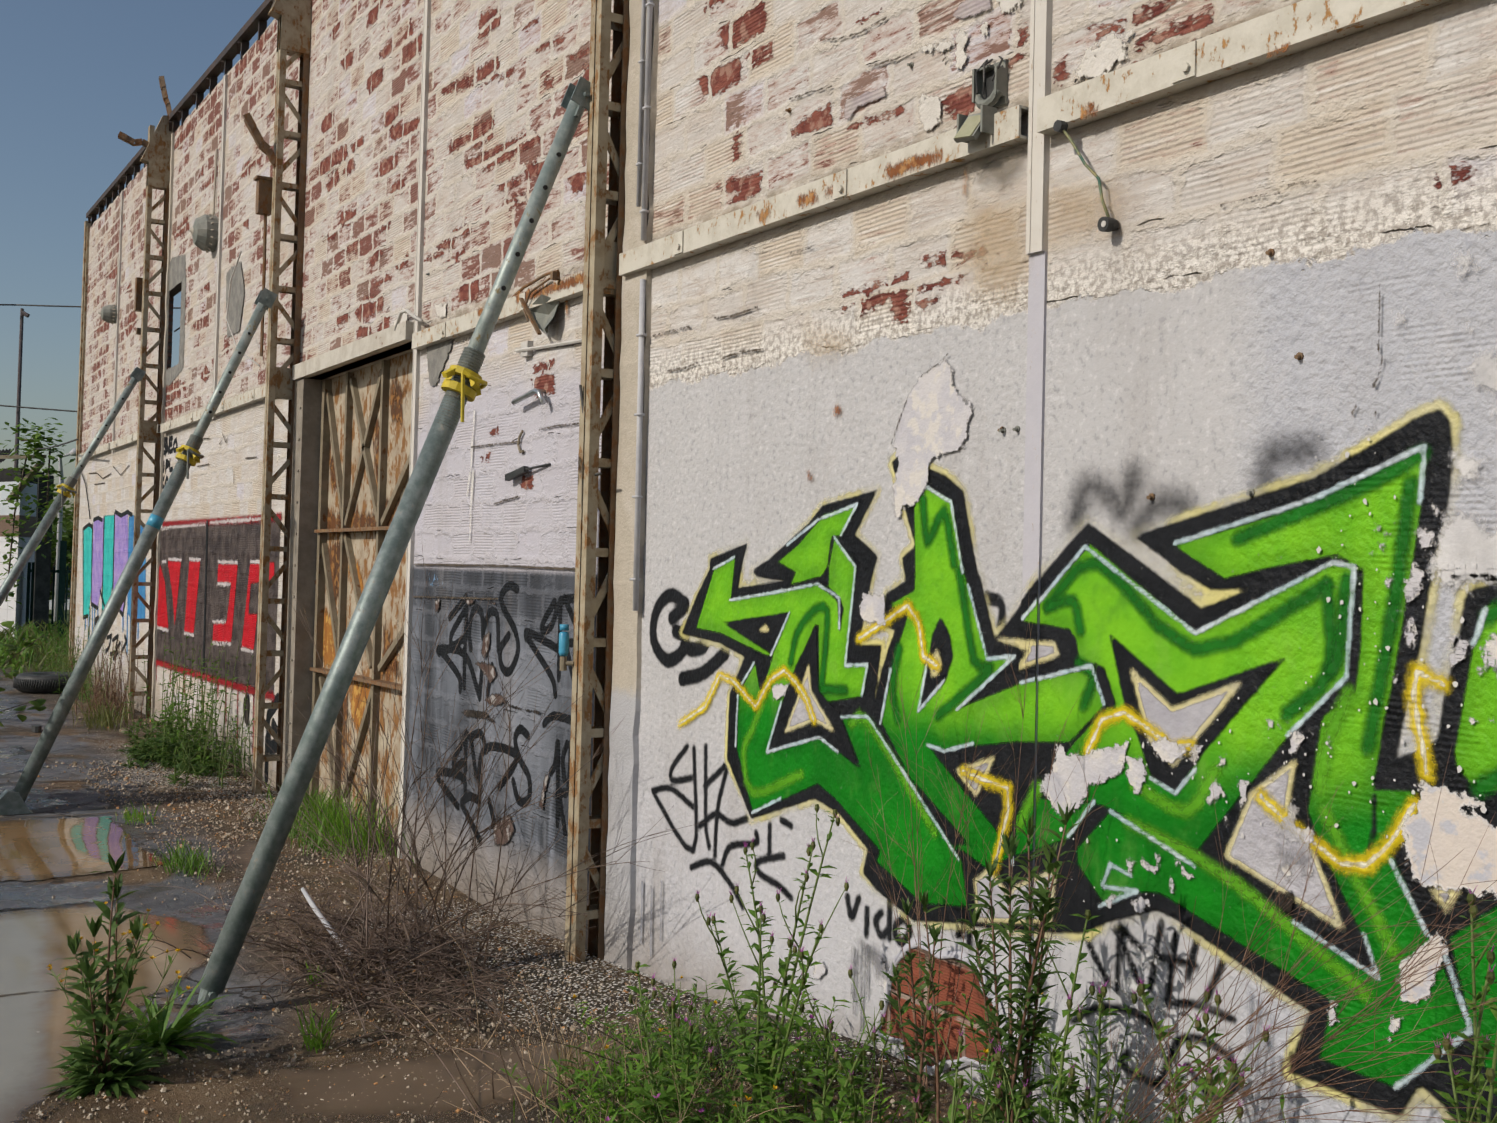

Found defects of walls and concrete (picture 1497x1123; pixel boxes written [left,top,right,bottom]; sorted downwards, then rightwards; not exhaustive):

peeling [696,0,773,99]
peeling [715,130,763,204]
peeling [322,208,480,339]
peeling [842,243,1010,324]
peeling [892,358,973,518]
corrosion [323,380,407,667]
corrosion [341,624,401,778]
peeling [1083,854,1194,925]
peeling [1039,698,1389,913]
peeling [1386,765,1497,898]
spalling [874,939,1008,1075]
peeling [1388,933,1449,1042]